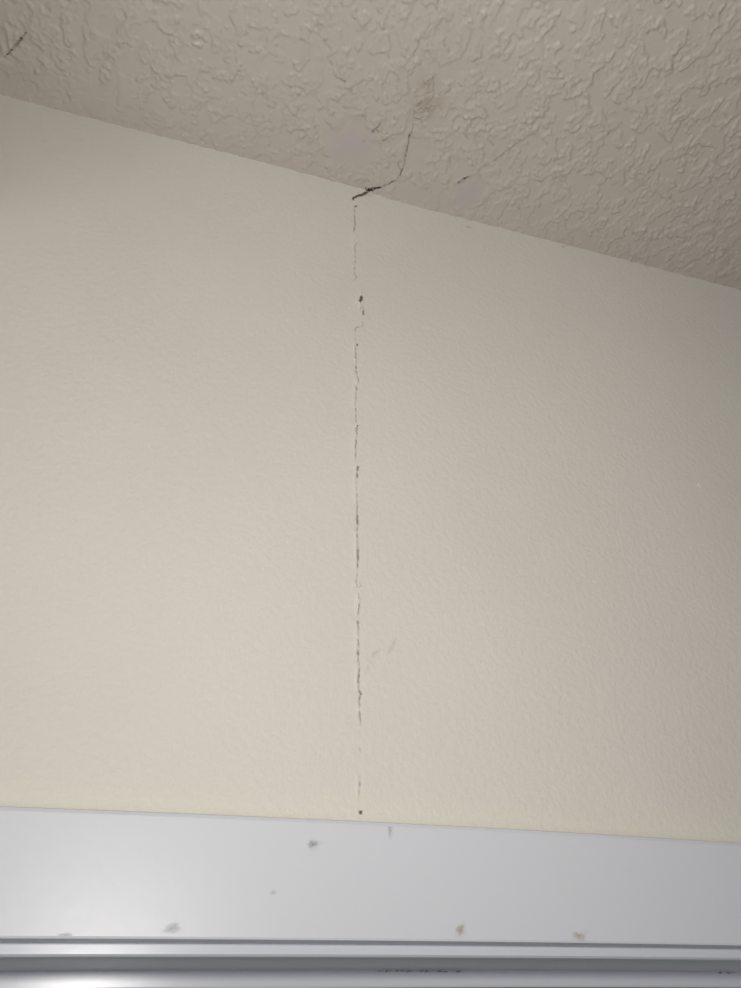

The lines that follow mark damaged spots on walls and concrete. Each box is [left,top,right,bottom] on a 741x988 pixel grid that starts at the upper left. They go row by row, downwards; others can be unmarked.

crack [352,181,393,207]